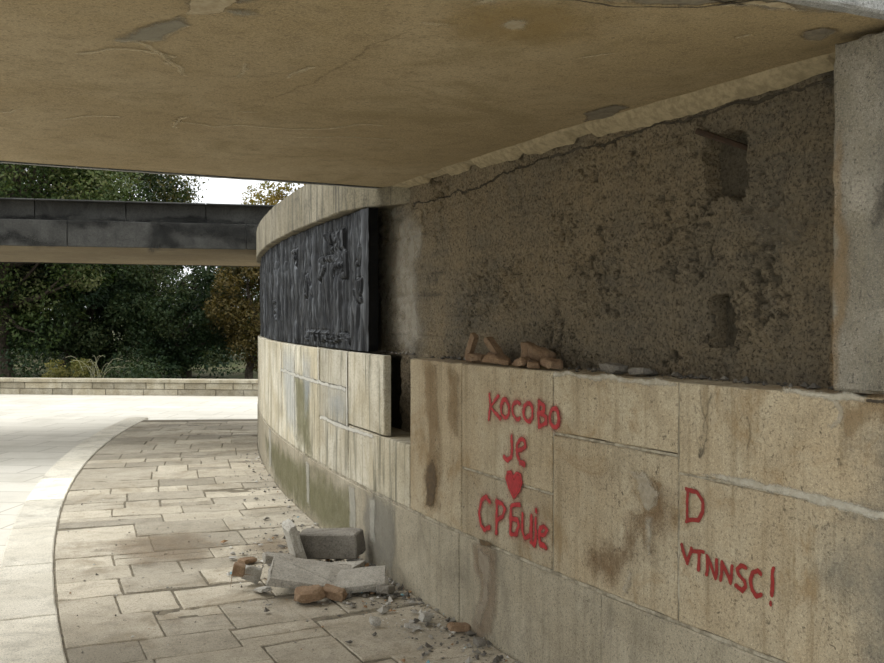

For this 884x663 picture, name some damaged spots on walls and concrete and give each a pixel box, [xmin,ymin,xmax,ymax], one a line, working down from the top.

peeling [114,0,254,42]
peeling [628,0,843,13]
peeling [393,52,835,188]
crack [413,76,834,207]
spalling [695,127,748,201]